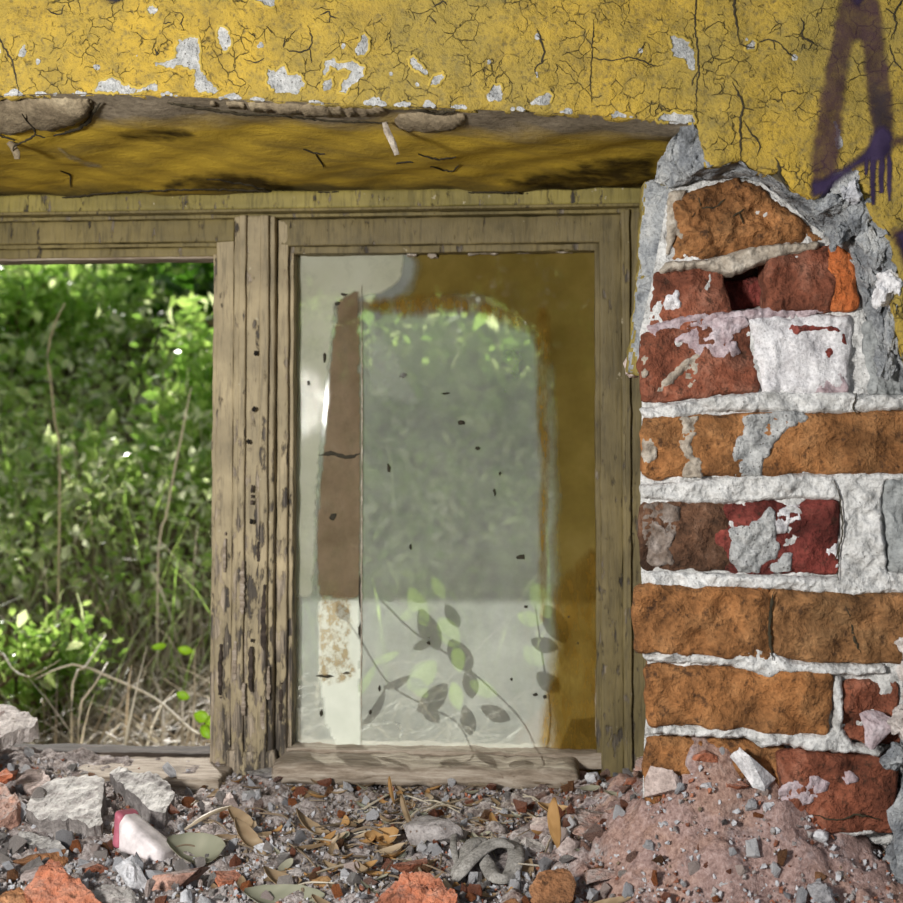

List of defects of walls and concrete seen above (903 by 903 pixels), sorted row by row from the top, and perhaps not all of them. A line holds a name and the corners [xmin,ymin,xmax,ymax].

crack [0,39,101,151]
peeling [71,64,178,97]
peeling [153,34,307,102]
peeling [320,31,372,96]
peeling [363,97,411,107]
crack [412,108,454,116]
crack [587,19,664,103]
peeling [668,32,695,70]
crack [692,0,700,117]
crack [732,82,791,192]
crack [732,0,818,58]
flaking render [631,109,903,884]